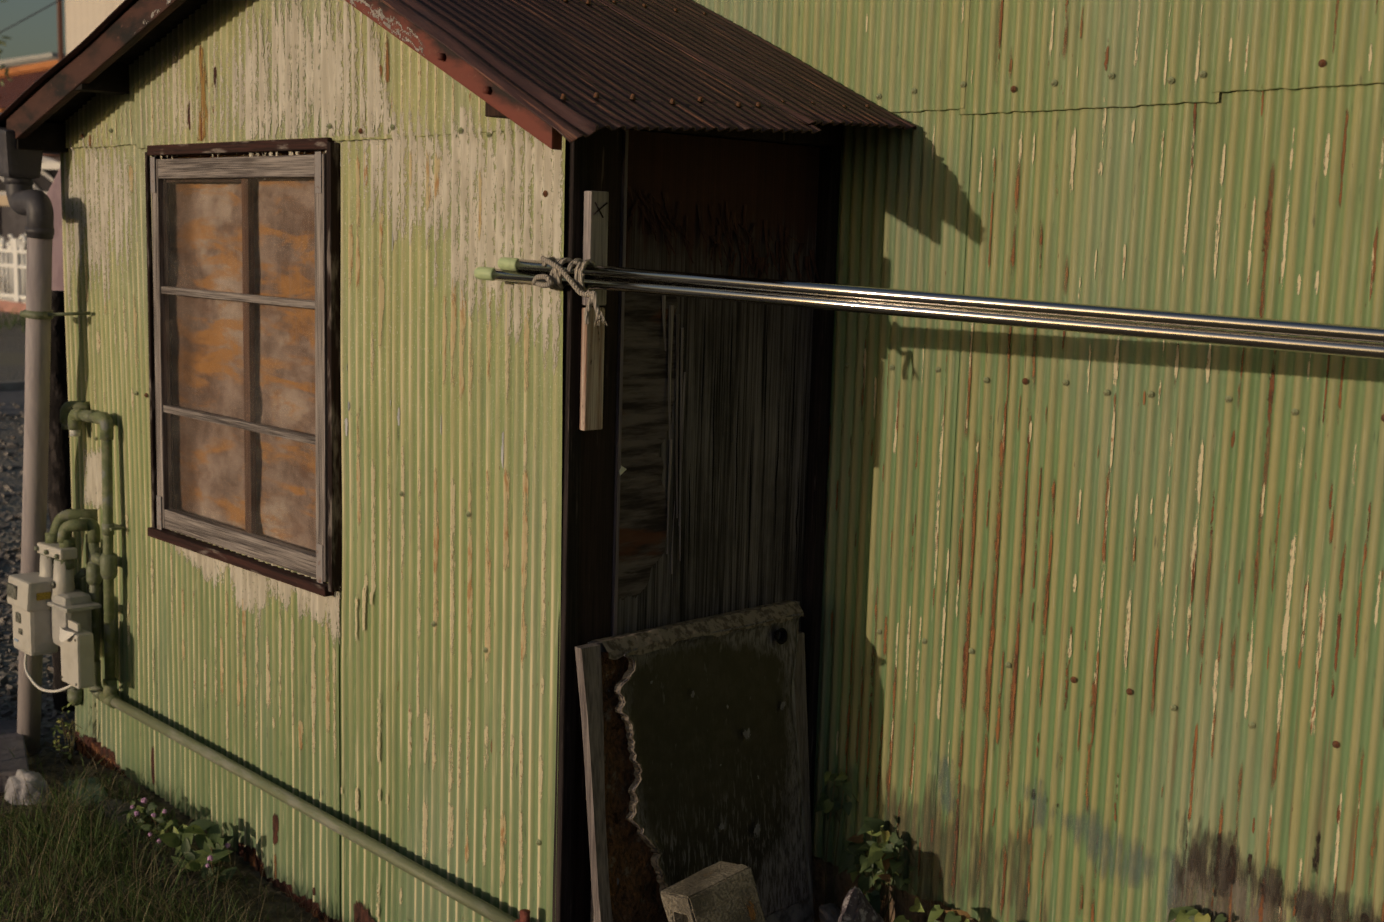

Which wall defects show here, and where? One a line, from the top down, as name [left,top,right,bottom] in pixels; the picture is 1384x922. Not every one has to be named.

corrosion [187,45,216,141]
peeling [60,0,563,404]
corrosion [1247,168,1274,318]
corrosion [1339,110,1348,206]
peeling [127,400,543,857]
corrosion [1298,484,1371,729]
corrosion [75,731,126,777]
peeling [518,812,541,887]
water stain [1167,831,1380,922]